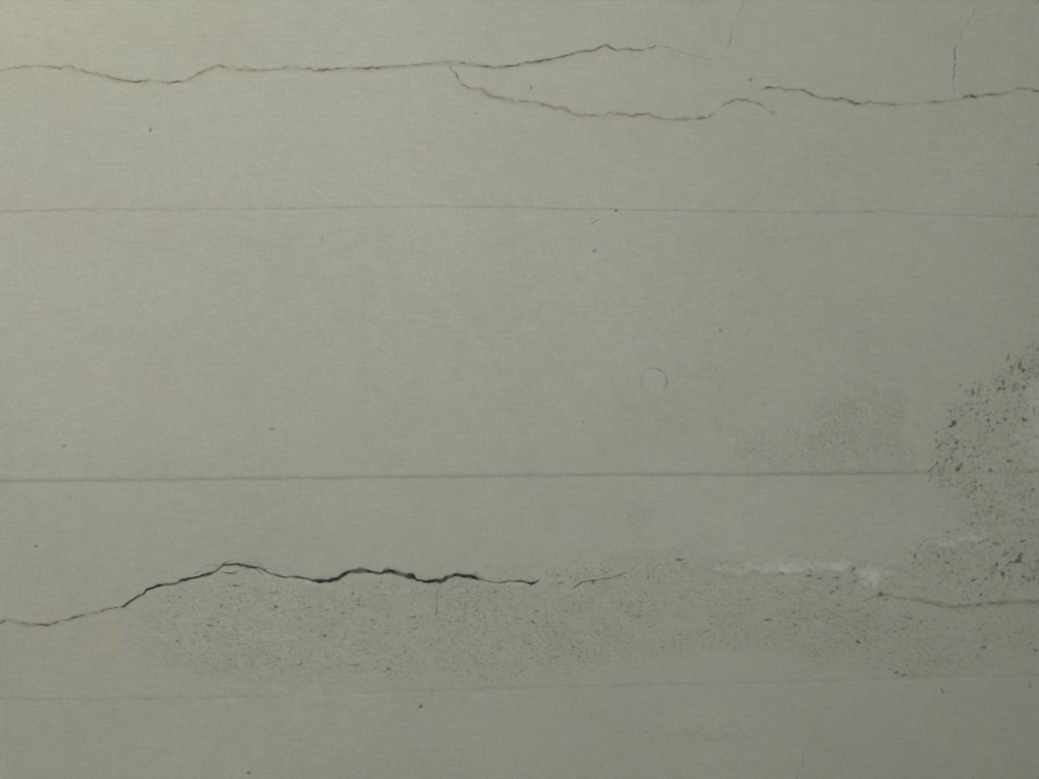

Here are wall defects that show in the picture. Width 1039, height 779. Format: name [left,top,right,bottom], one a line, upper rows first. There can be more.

crack [0,42,1039,123]
crack [0,563,538,629]
spalling [124,539,1039,708]